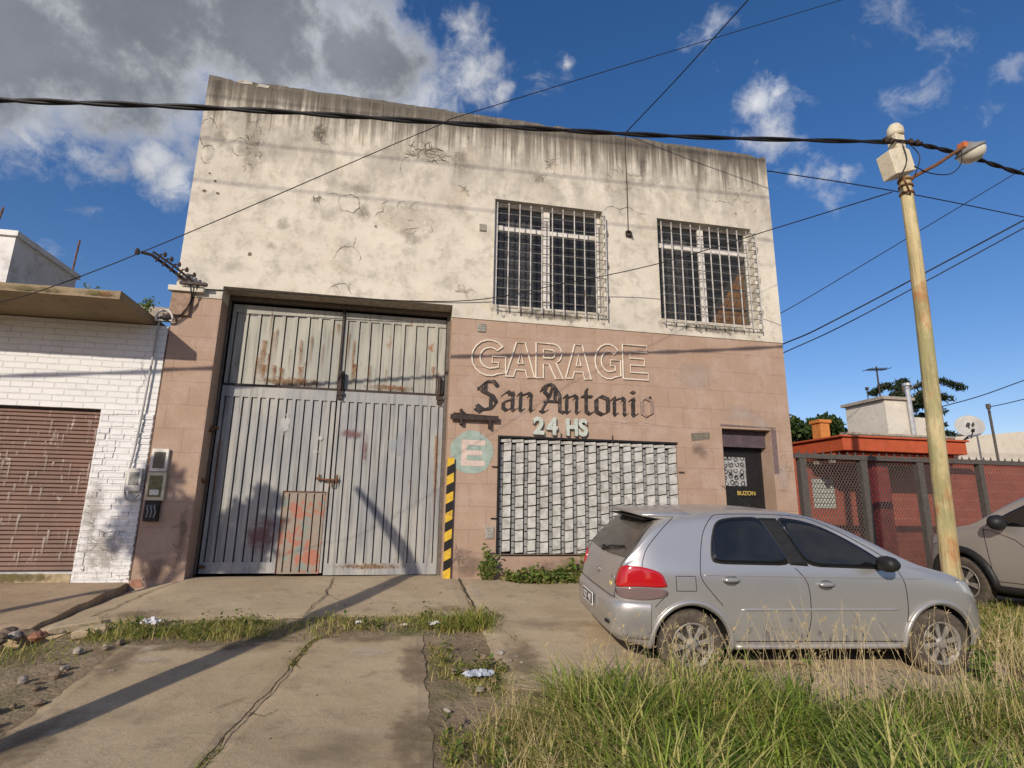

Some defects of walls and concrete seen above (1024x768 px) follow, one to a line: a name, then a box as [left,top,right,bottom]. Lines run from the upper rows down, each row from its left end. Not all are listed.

crack [317,193,364,259]
rust [256,312,323,386]